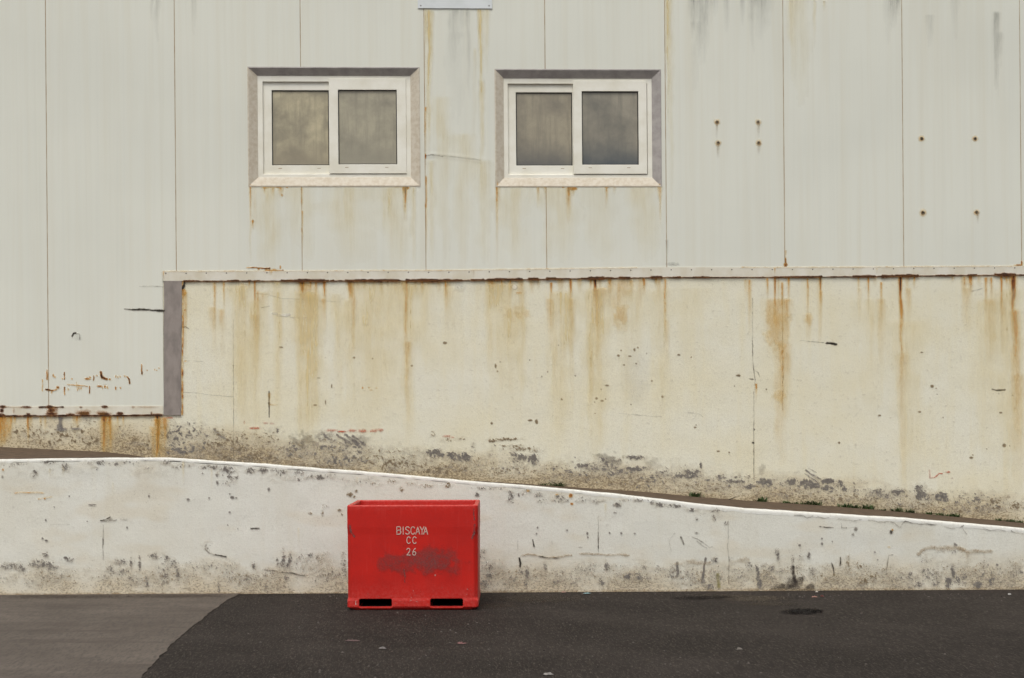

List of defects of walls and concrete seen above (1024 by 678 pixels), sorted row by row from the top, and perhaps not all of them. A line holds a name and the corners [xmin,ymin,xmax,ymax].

rust [181,258,1024,415]
rust [0,364,167,453]
leakage [751,566,814,591]